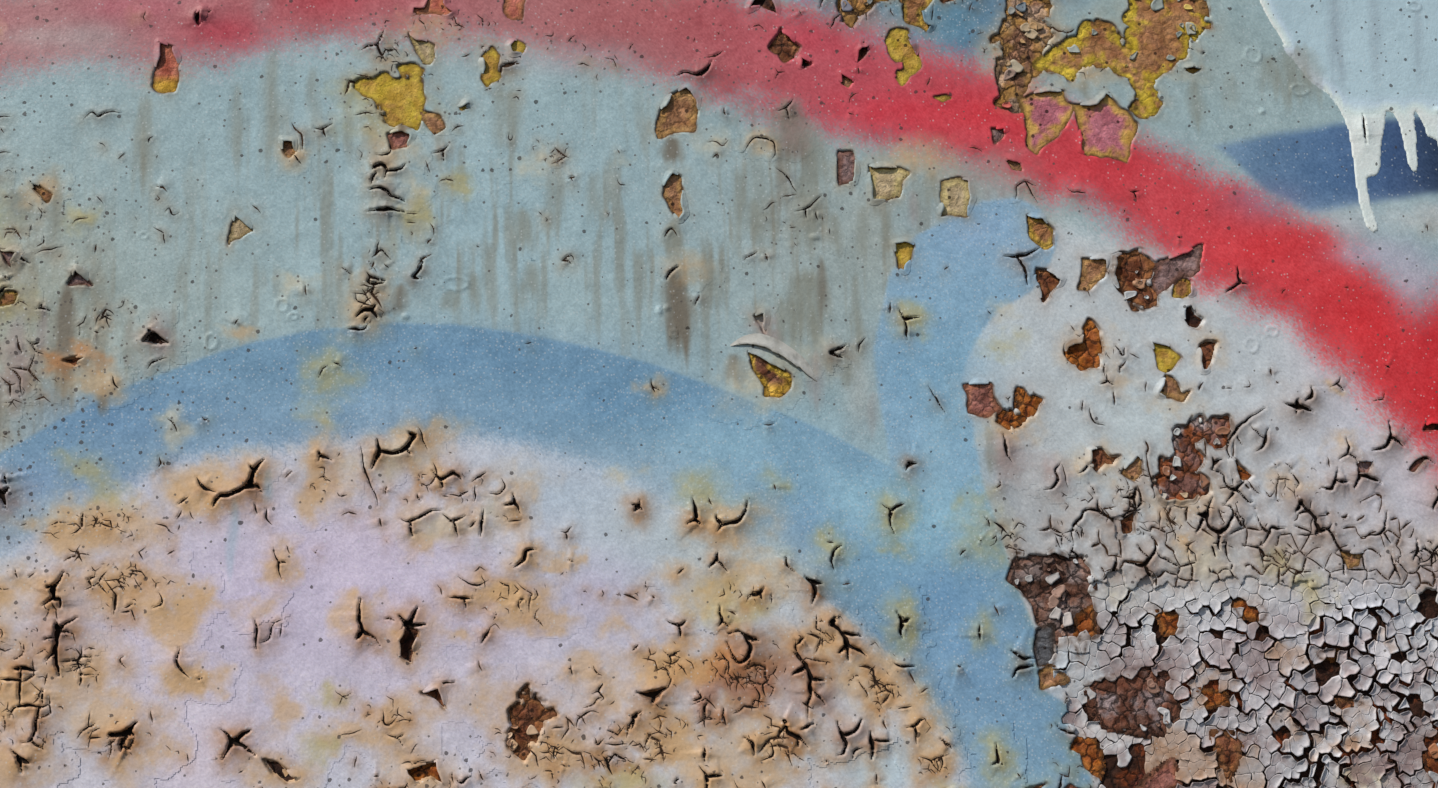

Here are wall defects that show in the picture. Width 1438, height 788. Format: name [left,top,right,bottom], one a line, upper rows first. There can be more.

crack [280,15,634,331]
rust [688,87,818,167]
peeling [990,0,1211,171]
crack [0,111,176,437]
peeling [1031,244,1216,402]
crack [0,427,955,788]
rust [0,162,1391,788]
peeling [1006,546,1100,690]
peeling [1084,415,1252,508]
crack [960,365,1438,788]
rust [1400,517,1438,595]
peeling [1070,665,1181,781]